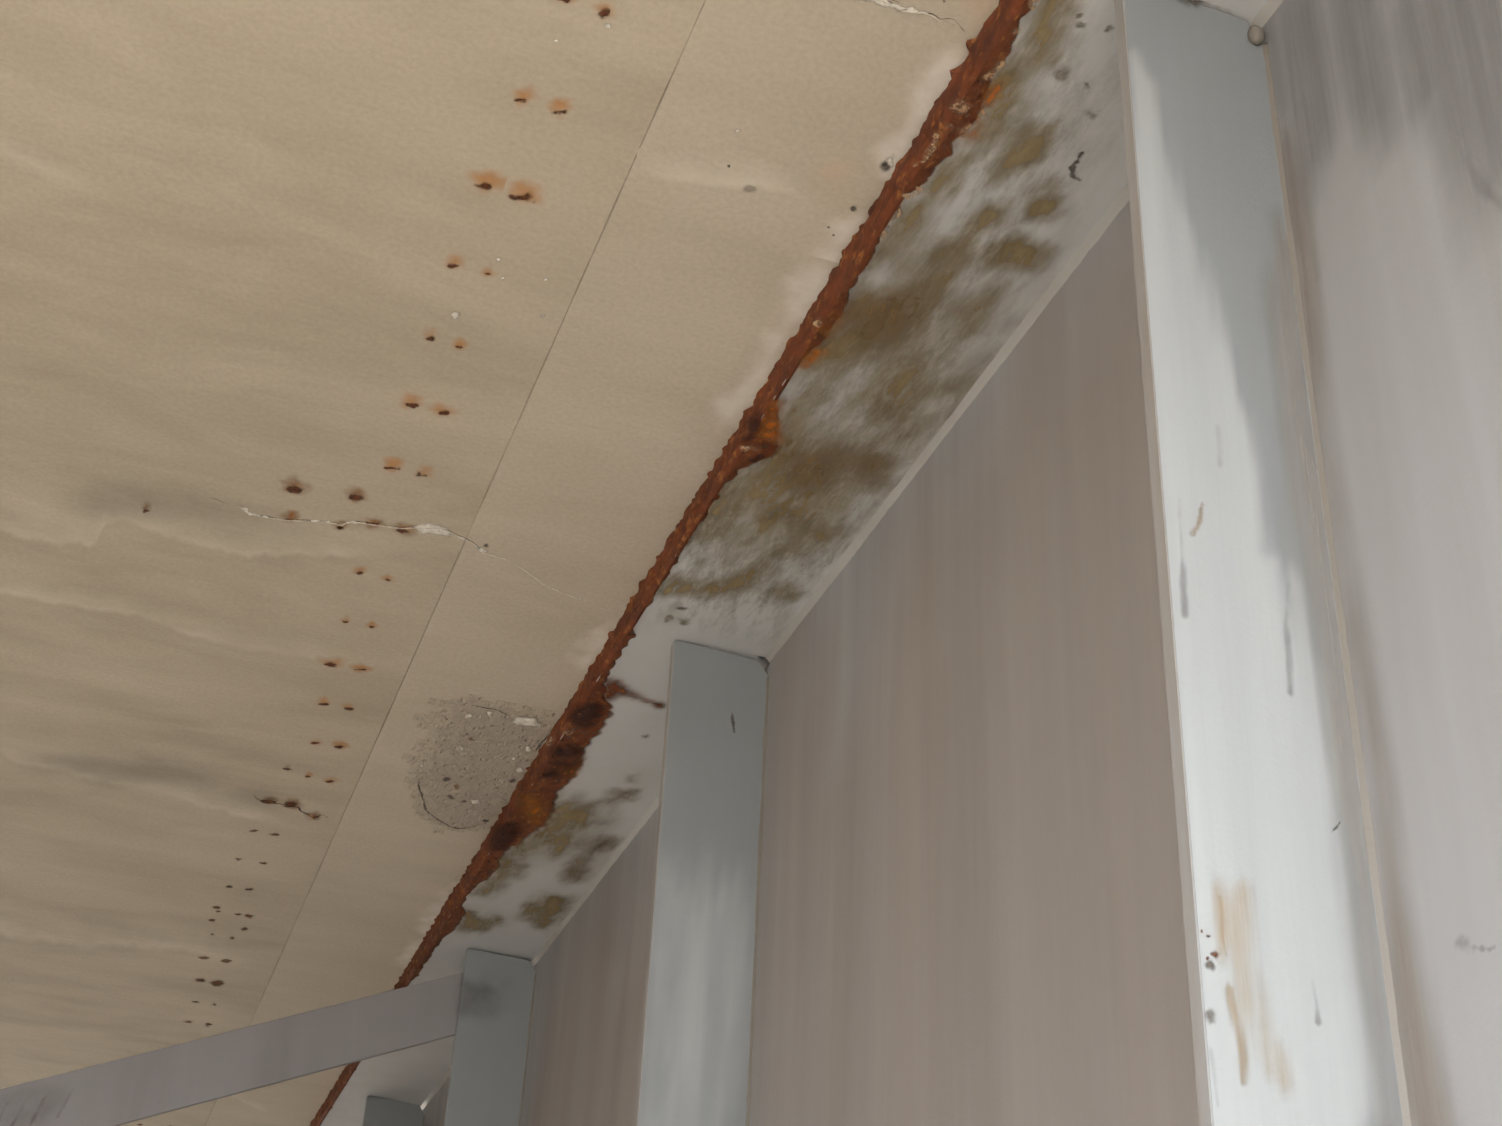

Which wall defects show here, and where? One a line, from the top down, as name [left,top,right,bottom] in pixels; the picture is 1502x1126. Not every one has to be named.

crack [853,0,966,34]
corrosion [460,164,551,210]
leakage [634,147,804,201]
leakage [859,38,969,186]
corrosion [871,0,1084,261]
leakage [700,205,869,438]
corrosion [689,350,965,550]
crack [213,498,581,599]
leakage [558,601,628,675]
corrosion [603,680,665,708]
leakage [1127,38,1388,1126]
spalling [401,694,600,851]